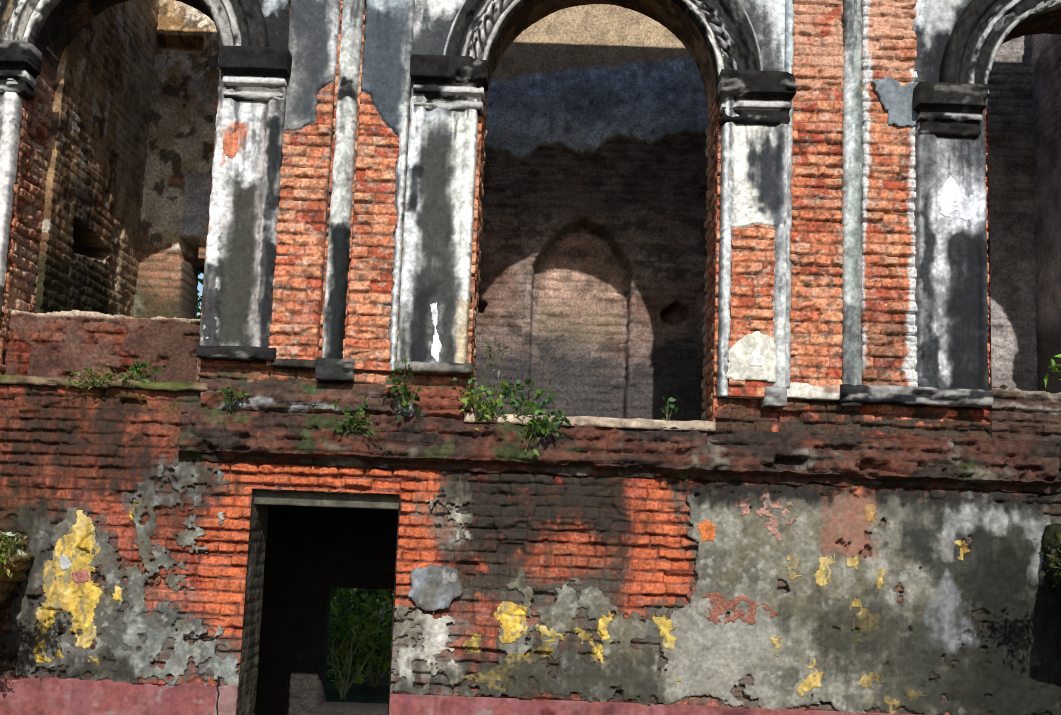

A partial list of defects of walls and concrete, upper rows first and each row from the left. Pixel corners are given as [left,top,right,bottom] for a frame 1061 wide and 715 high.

flaking render [871,77,918,127]
leakage [221,119,279,348]
spalling [344,92,399,371]
leakage [406,125,455,363]
spalling [726,224,777,398]
leakage [946,238,988,390]
flaking render [4,456,239,688]
flaking render [390,473,1061,715]
leakage [817,592,958,715]
leakage [903,522,933,566]
leakage [955,529,1061,715]